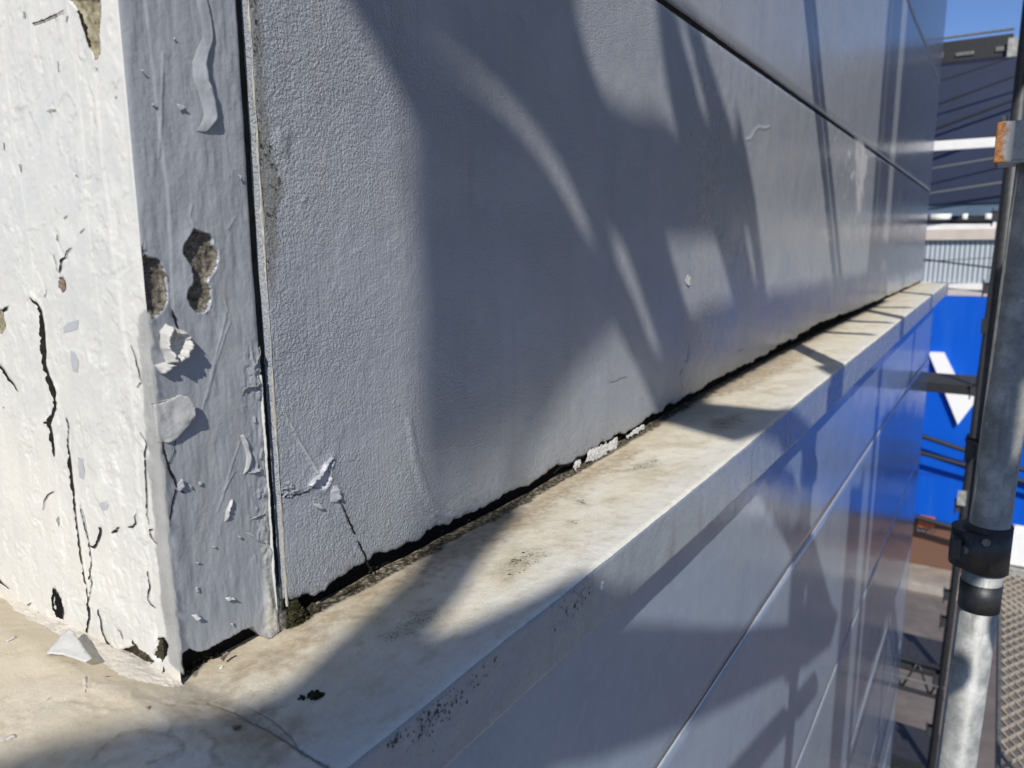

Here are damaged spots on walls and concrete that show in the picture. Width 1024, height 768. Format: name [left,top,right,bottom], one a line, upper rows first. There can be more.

peeling [66,0,101,70]
peeling [192,0,218,133]
spalling [142,248,167,324]
spalling [183,230,217,313]
crack [0,366,18,392]
crack [29,297,185,645]
peeling [151,394,196,443]
peeling [280,457,342,510]
spalling [573,425,645,471]
crack [340,500,373,572]
spalling [51,587,63,619]
damp [387,655,497,752]